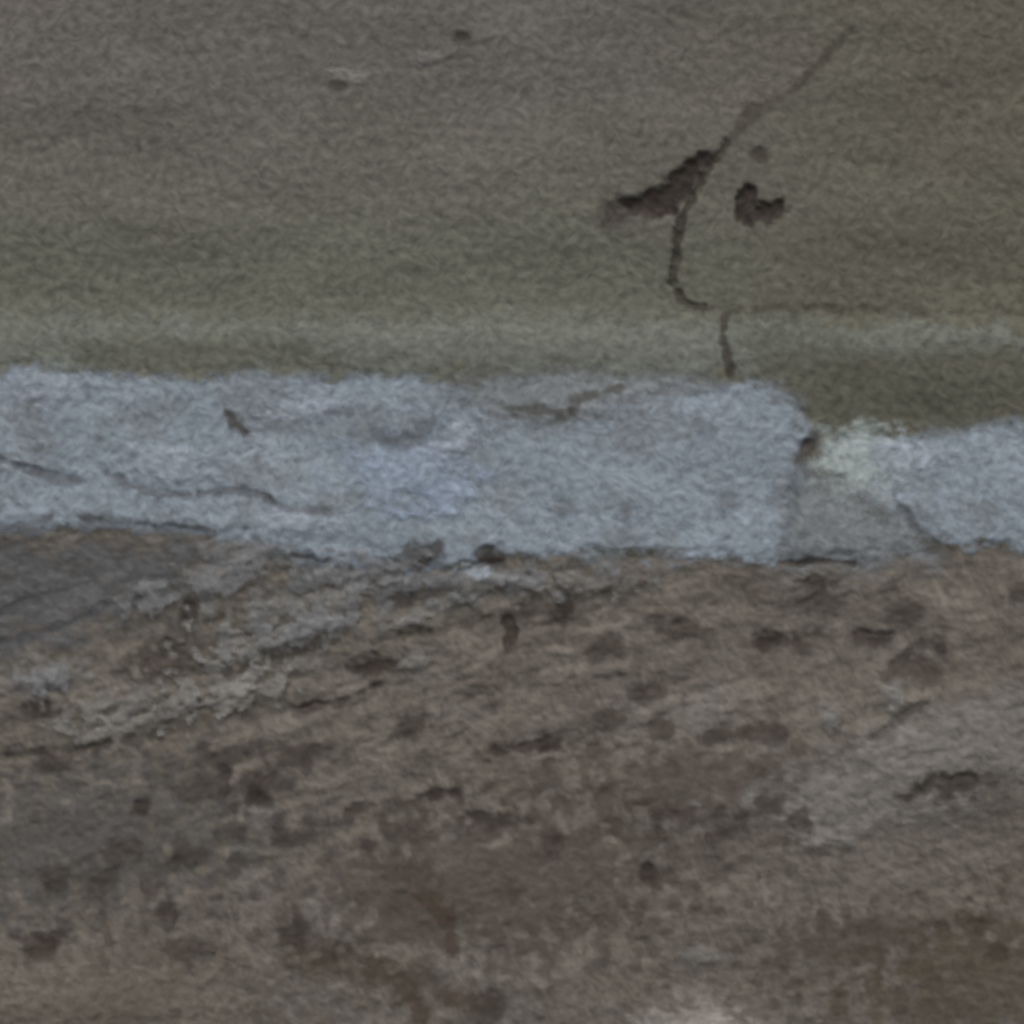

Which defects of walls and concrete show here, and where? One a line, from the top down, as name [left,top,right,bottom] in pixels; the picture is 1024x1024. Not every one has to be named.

spalling [602,152,713,225]
crack [669,140,734,376]
spalling [735,185,784,227]
spalling [0,360,1024,1024]